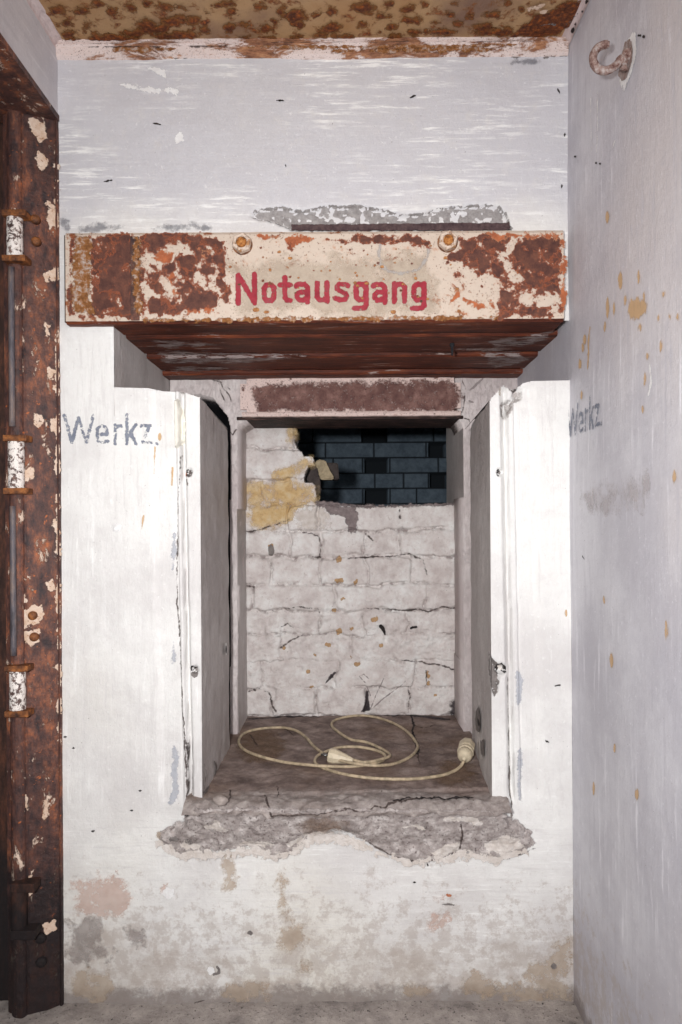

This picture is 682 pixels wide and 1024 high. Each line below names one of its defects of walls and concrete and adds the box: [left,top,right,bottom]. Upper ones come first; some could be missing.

rust [48,0,581,54]
spalling [253,204,513,232]
rust [66,231,568,324]
rust [252,378,463,412]
peeling [315,501,454,533]
crack [368,605,455,613]
crack [402,660,454,762]
peeling [157,806,535,862]
crack [264,786,473,862]
water stain [222,853,235,890]
water stain [281,925,303,950]
water stain [464,939,572,1002]